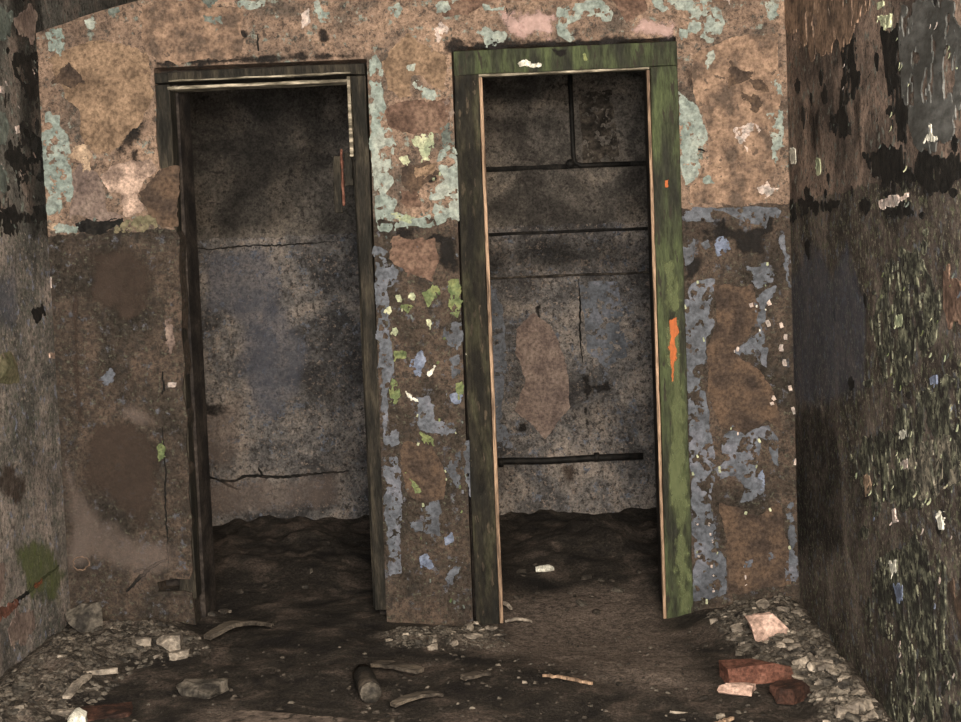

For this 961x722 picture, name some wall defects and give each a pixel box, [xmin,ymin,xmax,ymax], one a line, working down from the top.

peeling [301,0,330,28]
peeling [518,59,542,68]
spalling [0,0,266,237]
peeling [369,0,507,585]
rust [668,317,679,381]
crack [210,468,349,490]